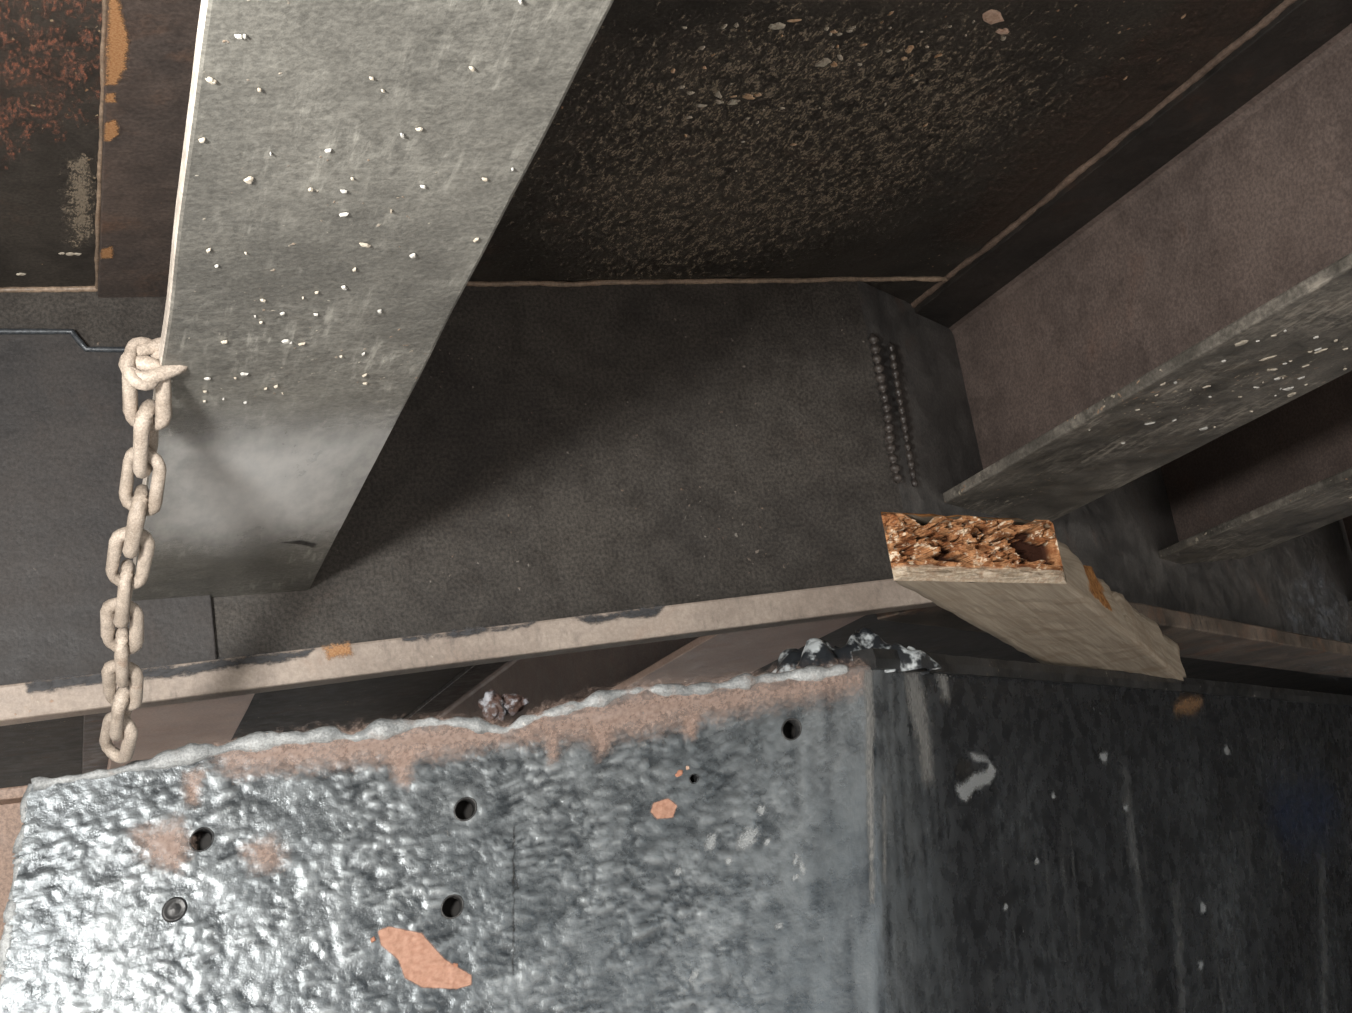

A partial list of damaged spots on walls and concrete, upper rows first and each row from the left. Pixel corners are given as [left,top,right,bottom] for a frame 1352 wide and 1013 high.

rust [0,0,128,159]
peeling [651,799,677,819]
peeling [370,927,472,989]